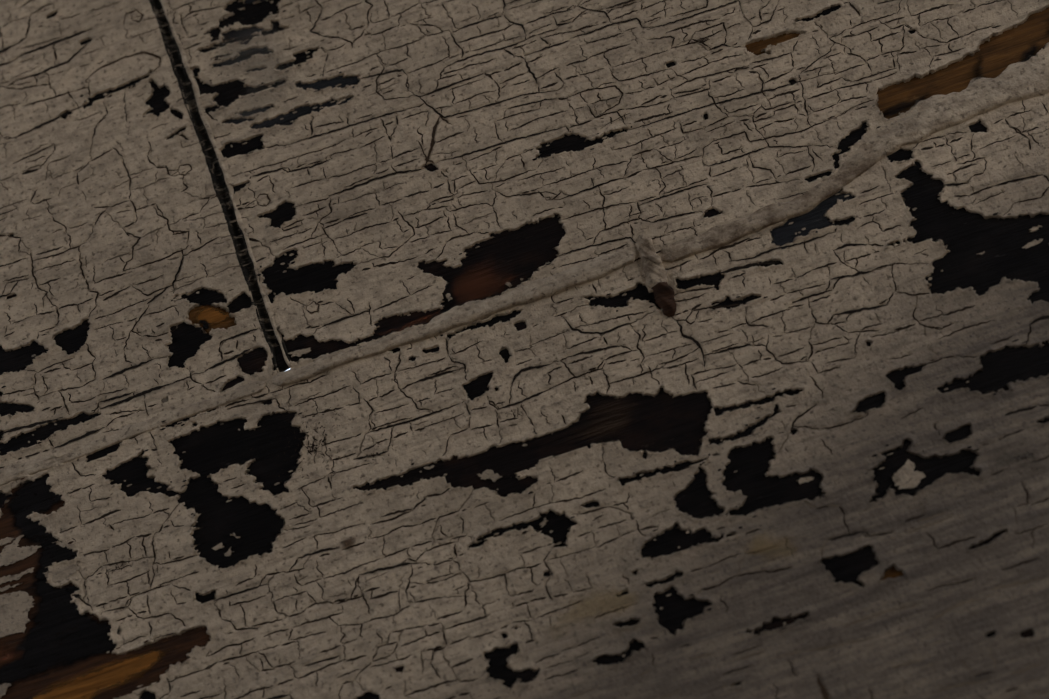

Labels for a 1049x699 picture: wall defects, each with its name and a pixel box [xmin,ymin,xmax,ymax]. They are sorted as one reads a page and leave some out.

peeling [0,319,90,417]
peeling [0,474,210,699]
crack [62,463,200,645]
peeling [102,400,306,569]
peeling [181,0,360,160]
peeling [223,214,566,391]
peeling [353,388,825,574]
crack [159,166,1049,699]
peeling [876,7,1049,119]
peeling [887,149,1049,304]
crack [913,100,1049,216]
peeling [937,339,1049,395]